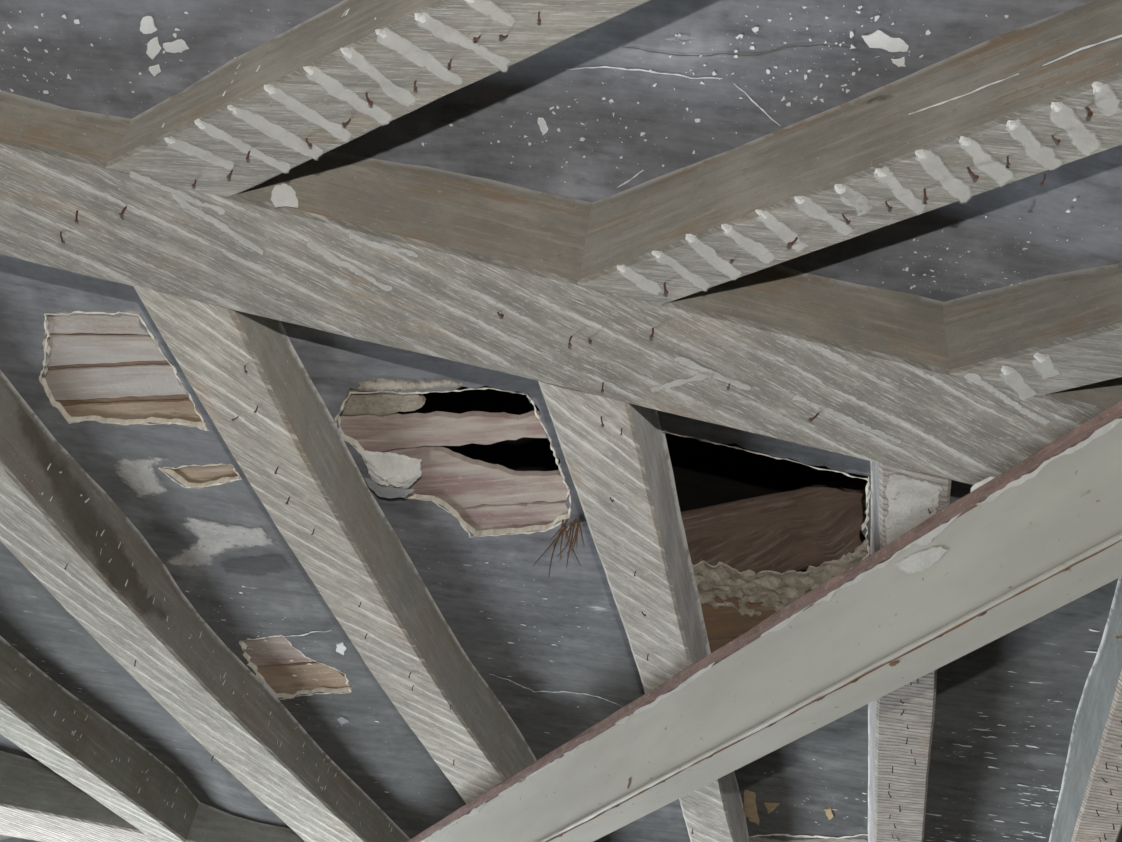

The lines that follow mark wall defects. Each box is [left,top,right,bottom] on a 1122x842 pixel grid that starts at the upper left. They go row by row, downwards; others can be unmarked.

peeling [685,16,771,109]
peeling [762,58,828,106]
peeling [771,5,923,93]
flaking render [39,309,207,431]
peeling [115,457,242,498]
flaking render [335,378,571,538]
peeling [975,419,1122,505]
flaking render [615,431,961,724]
flaking render [214,586,351,705]
peeling [498,740,589,795]
peeling [944,712,1056,769]
peeling [421,802,485,842]